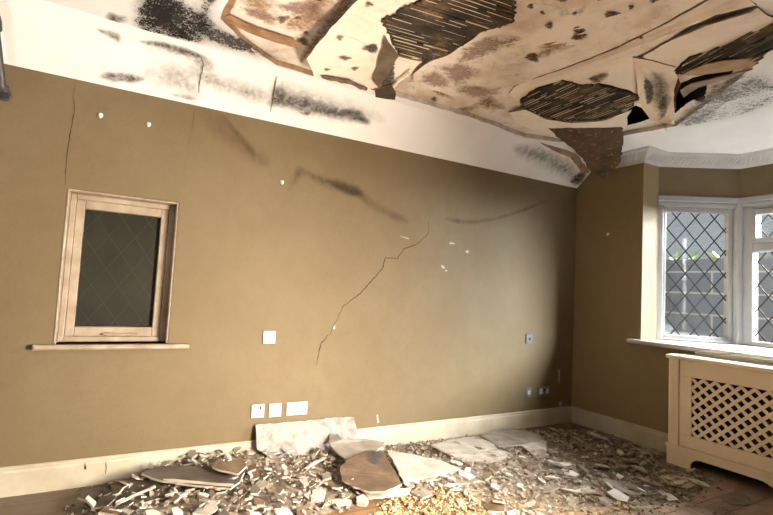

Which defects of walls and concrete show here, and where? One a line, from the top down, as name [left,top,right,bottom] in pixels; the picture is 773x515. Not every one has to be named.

water stain [134,0,272,62]
water stain [380,62,395,87]
crack [65,85,76,184]
water stain [273,89,367,123]
flaking render [540,142,589,174]
crack [309,221,429,400]